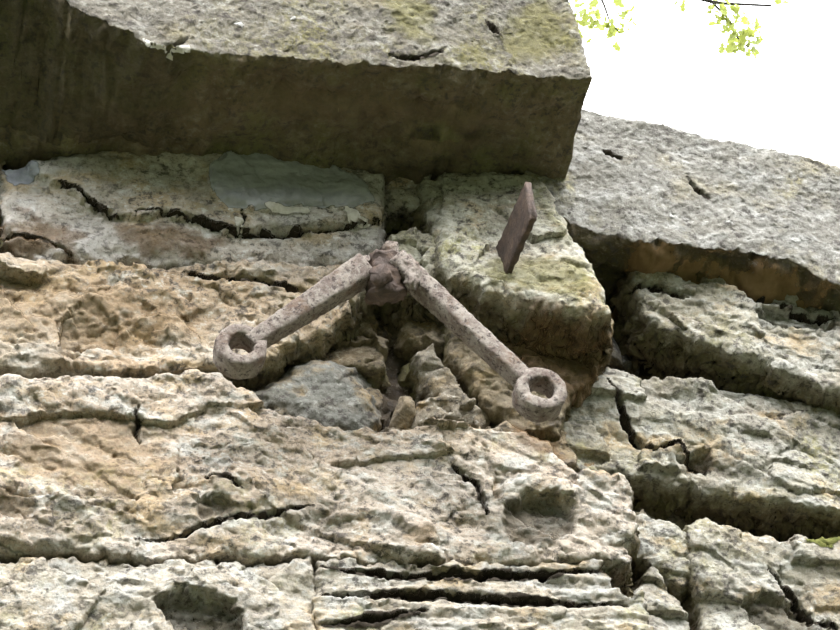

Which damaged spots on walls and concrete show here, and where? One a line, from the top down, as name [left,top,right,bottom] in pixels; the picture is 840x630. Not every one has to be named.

crack [0,209,72,258]
crack [58,179,383,240]
corrosion [509,301,604,401]
crack [134,408,142,445]
corrosion [513,426,561,459]
crack [608,378,711,475]